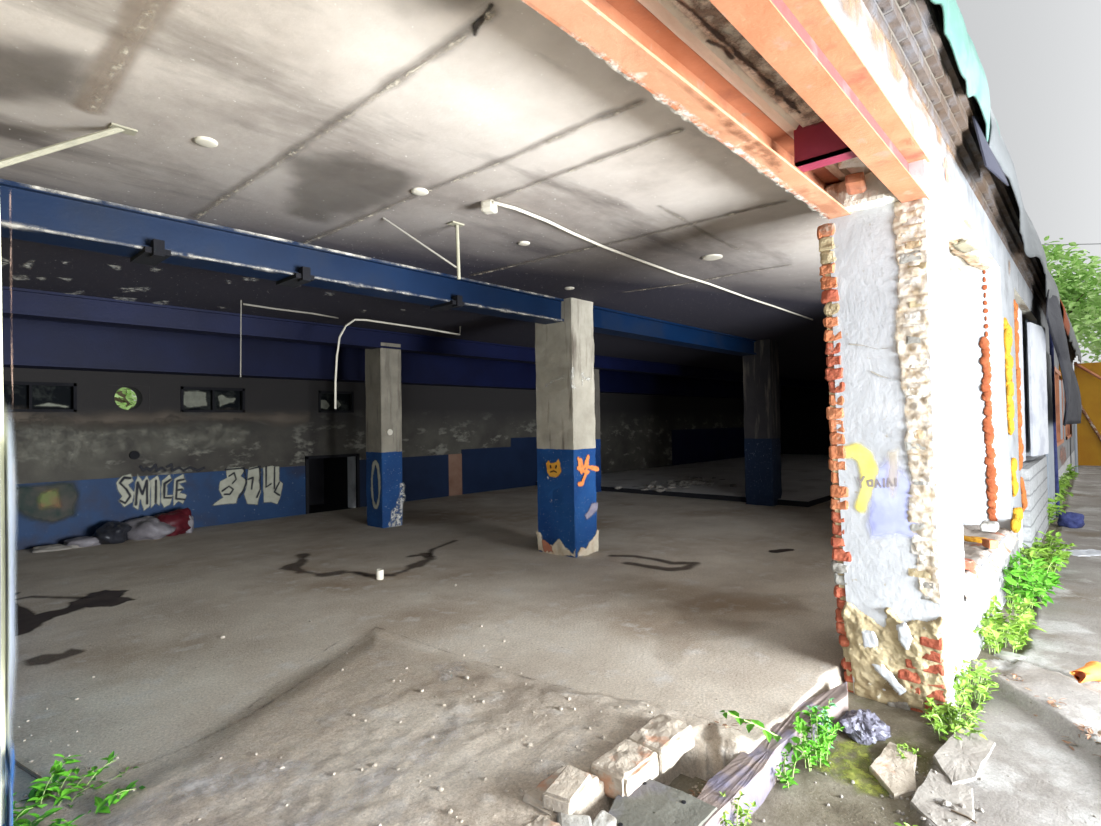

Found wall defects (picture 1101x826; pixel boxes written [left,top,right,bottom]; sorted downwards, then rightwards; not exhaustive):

peeling [654,94,714,136]
corrosion [842,0,950,151]
peeling [33,186,91,200]
flaking render [725,143,951,714]
flaking render [948,236,998,521]
flaking render [536,530,599,557]